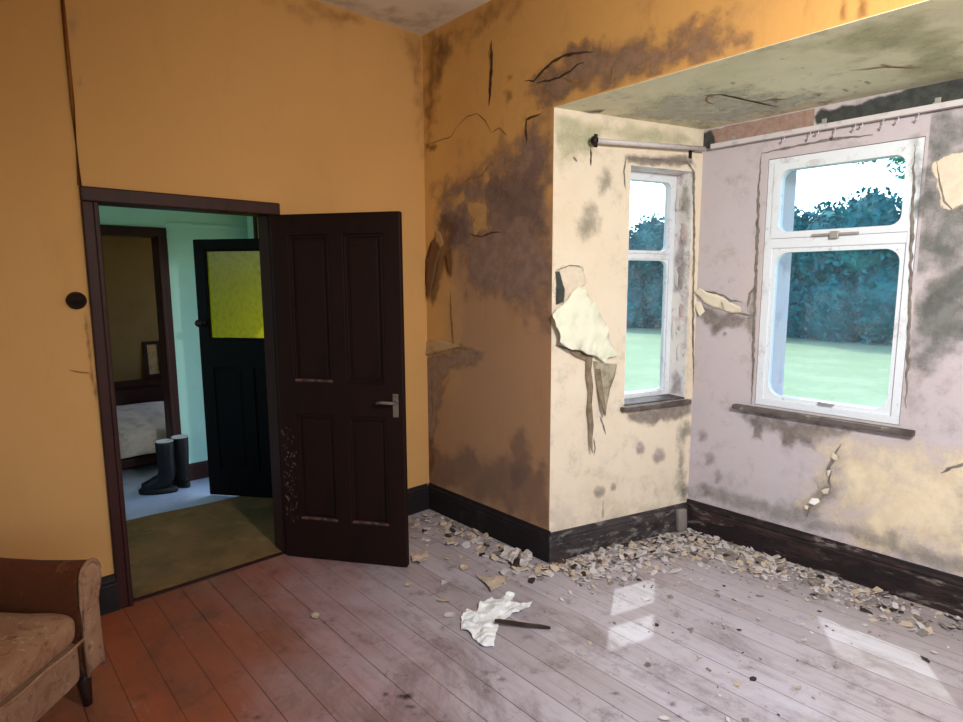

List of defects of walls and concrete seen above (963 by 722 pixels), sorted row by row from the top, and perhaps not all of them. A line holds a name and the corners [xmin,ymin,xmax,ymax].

crack [430,40,507,144]
water stain [815,78,963,124]
flaking render [435,123,585,305]
flaking render [623,156,751,382]
water stain [914,114,963,370]
flaking render [425,340,482,446]
flaking render [803,444,841,516]
water stain [751,413,963,556]
crack [941,463,963,473]